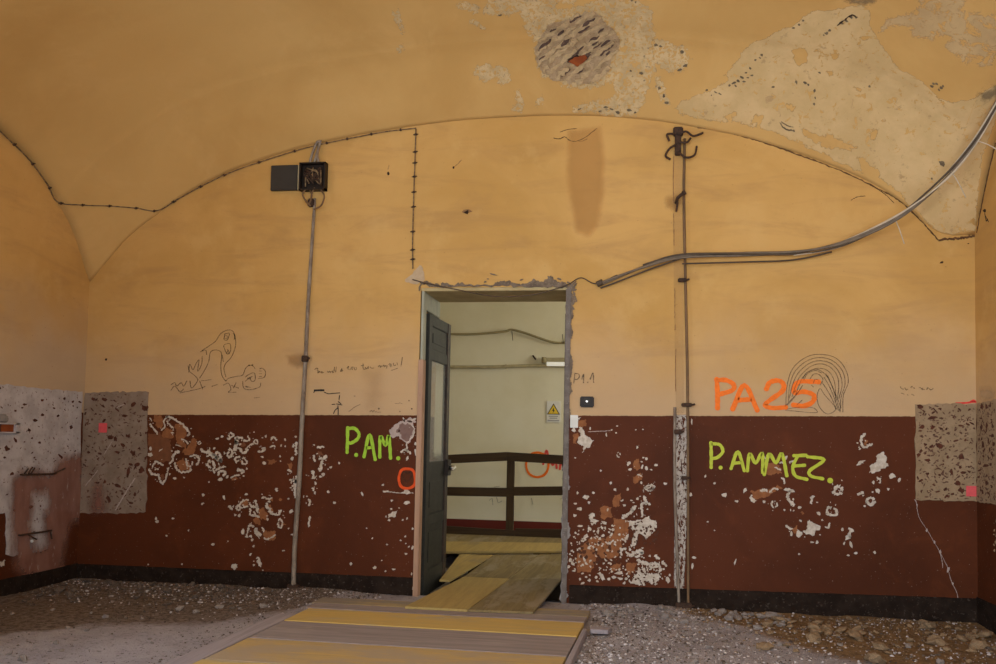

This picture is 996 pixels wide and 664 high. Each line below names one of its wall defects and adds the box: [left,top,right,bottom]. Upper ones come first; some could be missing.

peeling [455,0,996,235]
peeling [0,392,340,571]
peeling [385,500,414,555]
peeling [389,417,416,461]
peeling [419,273,671,586]
peeling [735,456,857,556]
peeling [857,433,901,507]